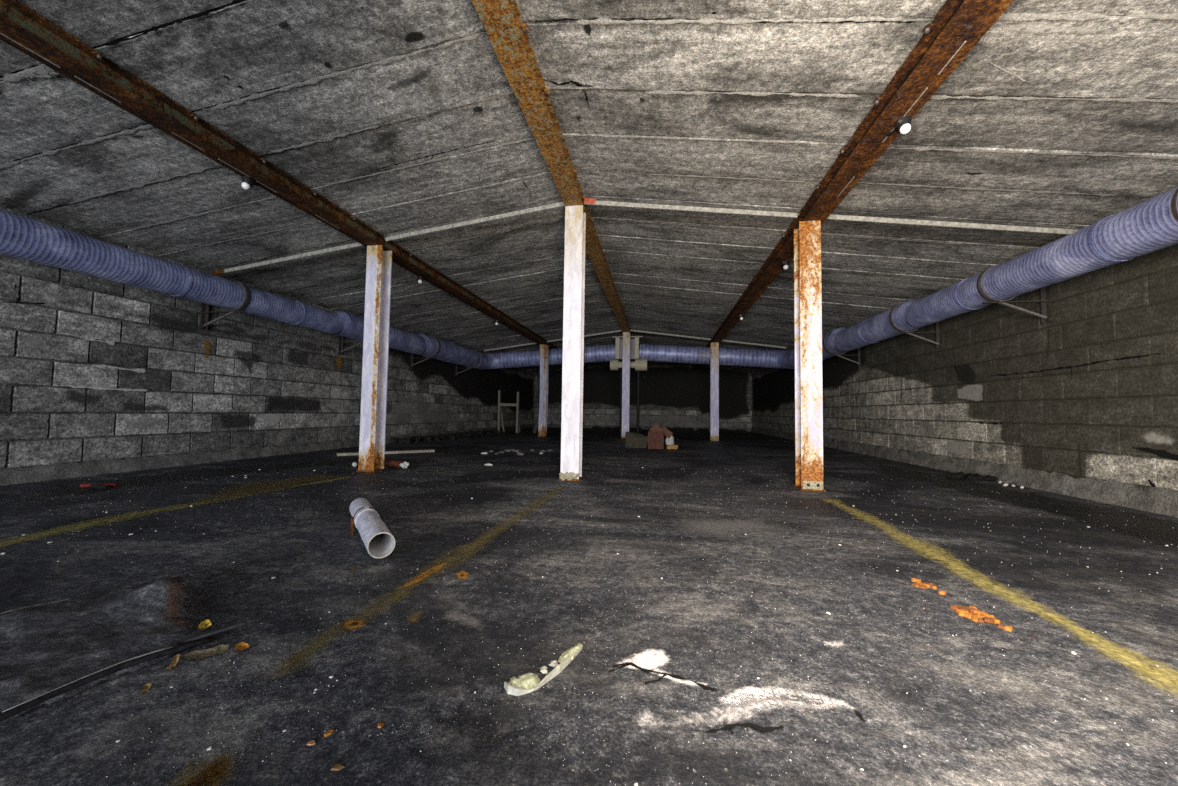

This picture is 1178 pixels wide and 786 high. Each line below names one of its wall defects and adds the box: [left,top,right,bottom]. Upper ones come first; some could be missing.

rust [175,758,228,786]